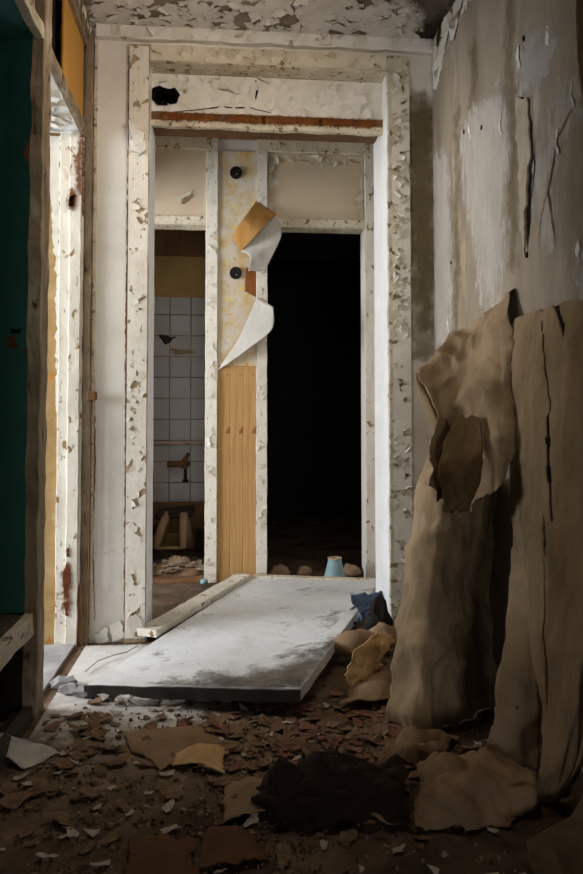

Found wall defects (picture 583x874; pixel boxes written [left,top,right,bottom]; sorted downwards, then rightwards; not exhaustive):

peeling [431,0,471,98]
peeling [514,26,558,98]
peeling [79,0,421,643]
peeling [433,149,453,349]
peeling [460,79,511,308]
peeling [530,72,583,256]
rust [60,547,73,617]